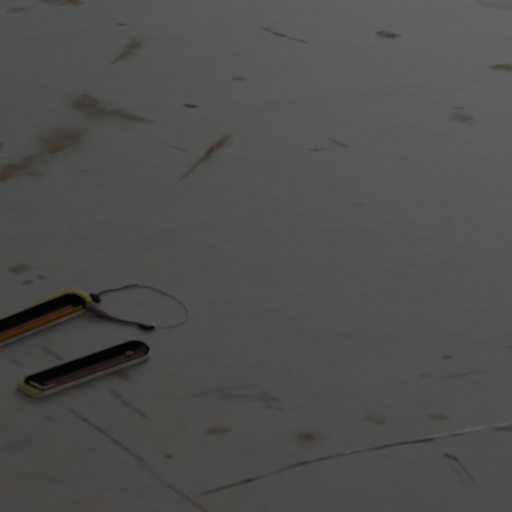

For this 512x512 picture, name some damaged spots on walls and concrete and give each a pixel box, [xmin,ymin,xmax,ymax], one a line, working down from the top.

crack [381,422,512,447]